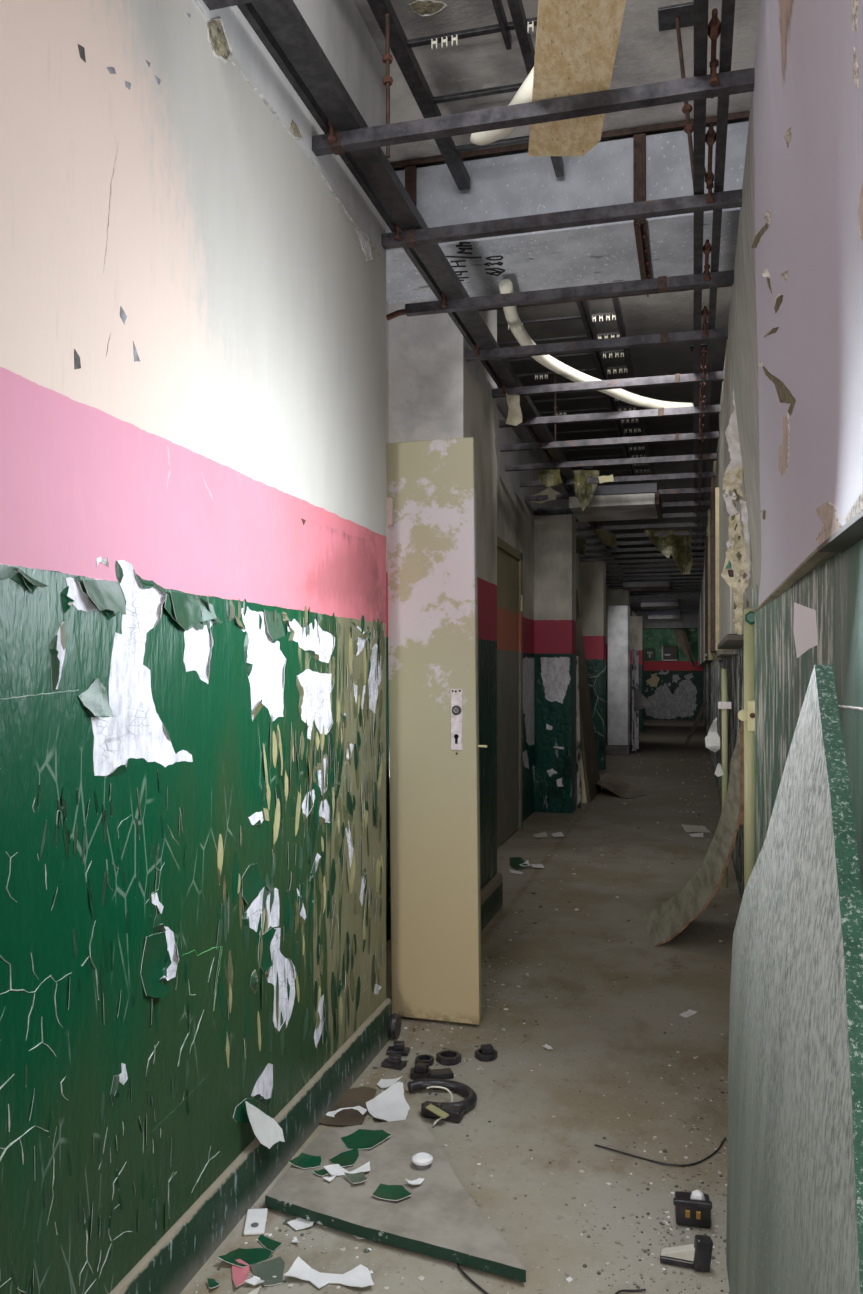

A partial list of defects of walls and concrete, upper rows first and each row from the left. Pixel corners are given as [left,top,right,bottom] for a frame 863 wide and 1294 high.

peeling [779,414,790,478]
peeling [816,492,863,545]
peeling [793,602,818,658]
crack [0,689,79,700]
peeling [523,656,571,787]
peeling [645,669,697,719]
crack [6,852,47,902]
crack [85,815,131,891]
crack [145,807,184,904]
peeling [0,557,385,1272]
crack [0,920,222,1294]